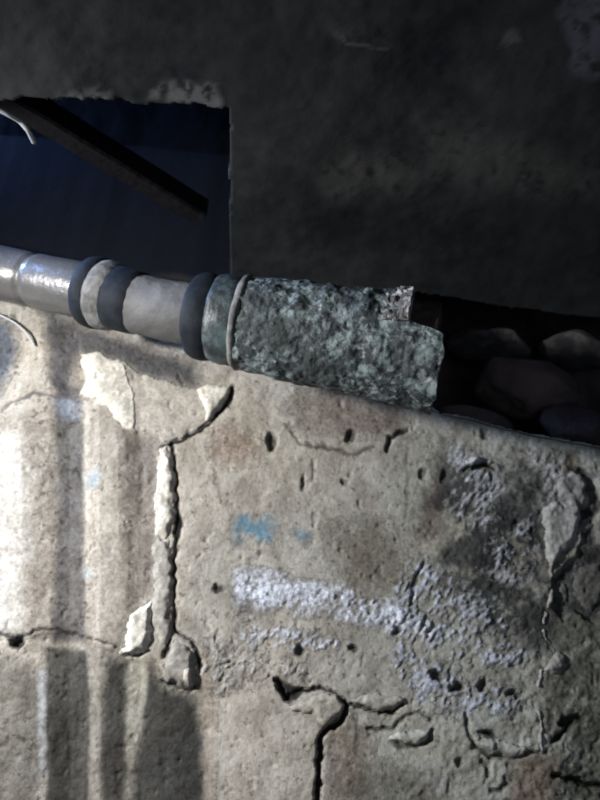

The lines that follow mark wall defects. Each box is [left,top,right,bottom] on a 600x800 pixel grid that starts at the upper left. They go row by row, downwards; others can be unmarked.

crack [463,459,498,472]
crack [0,383,235,694]
damp [0,308,600,800]
crack [272,677,436,800]
crack [463,711,600,795]